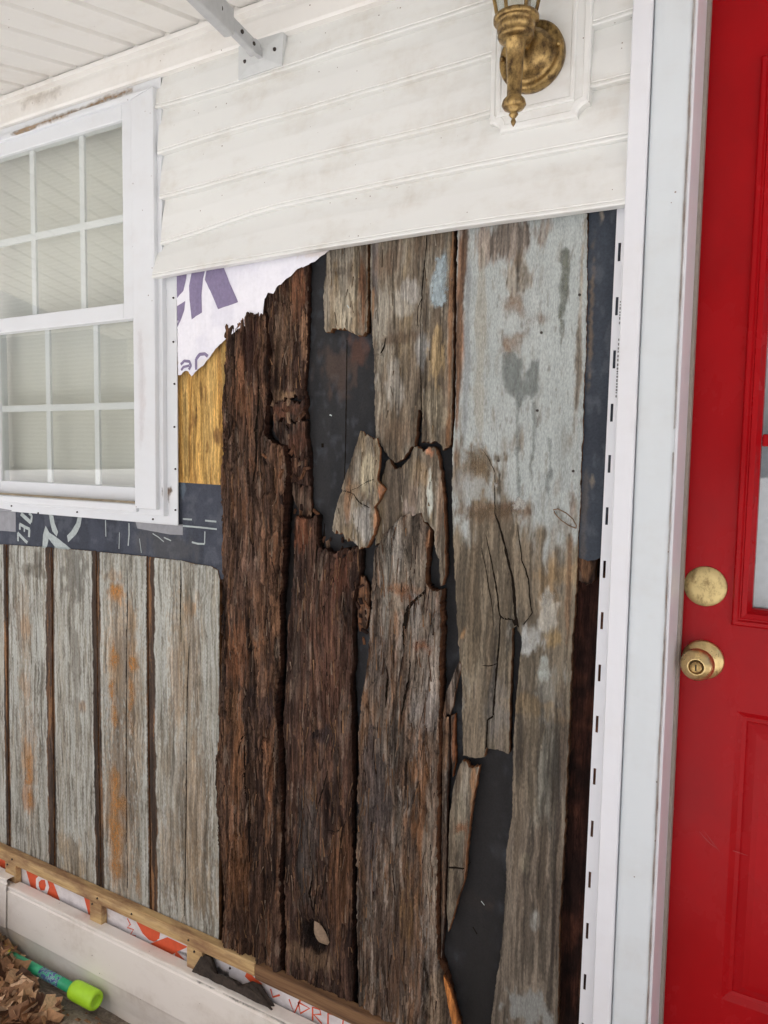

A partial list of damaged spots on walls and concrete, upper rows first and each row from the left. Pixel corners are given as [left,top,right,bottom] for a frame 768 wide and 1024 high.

leakage [503,354,537,405]
crack [481,449,533,749]